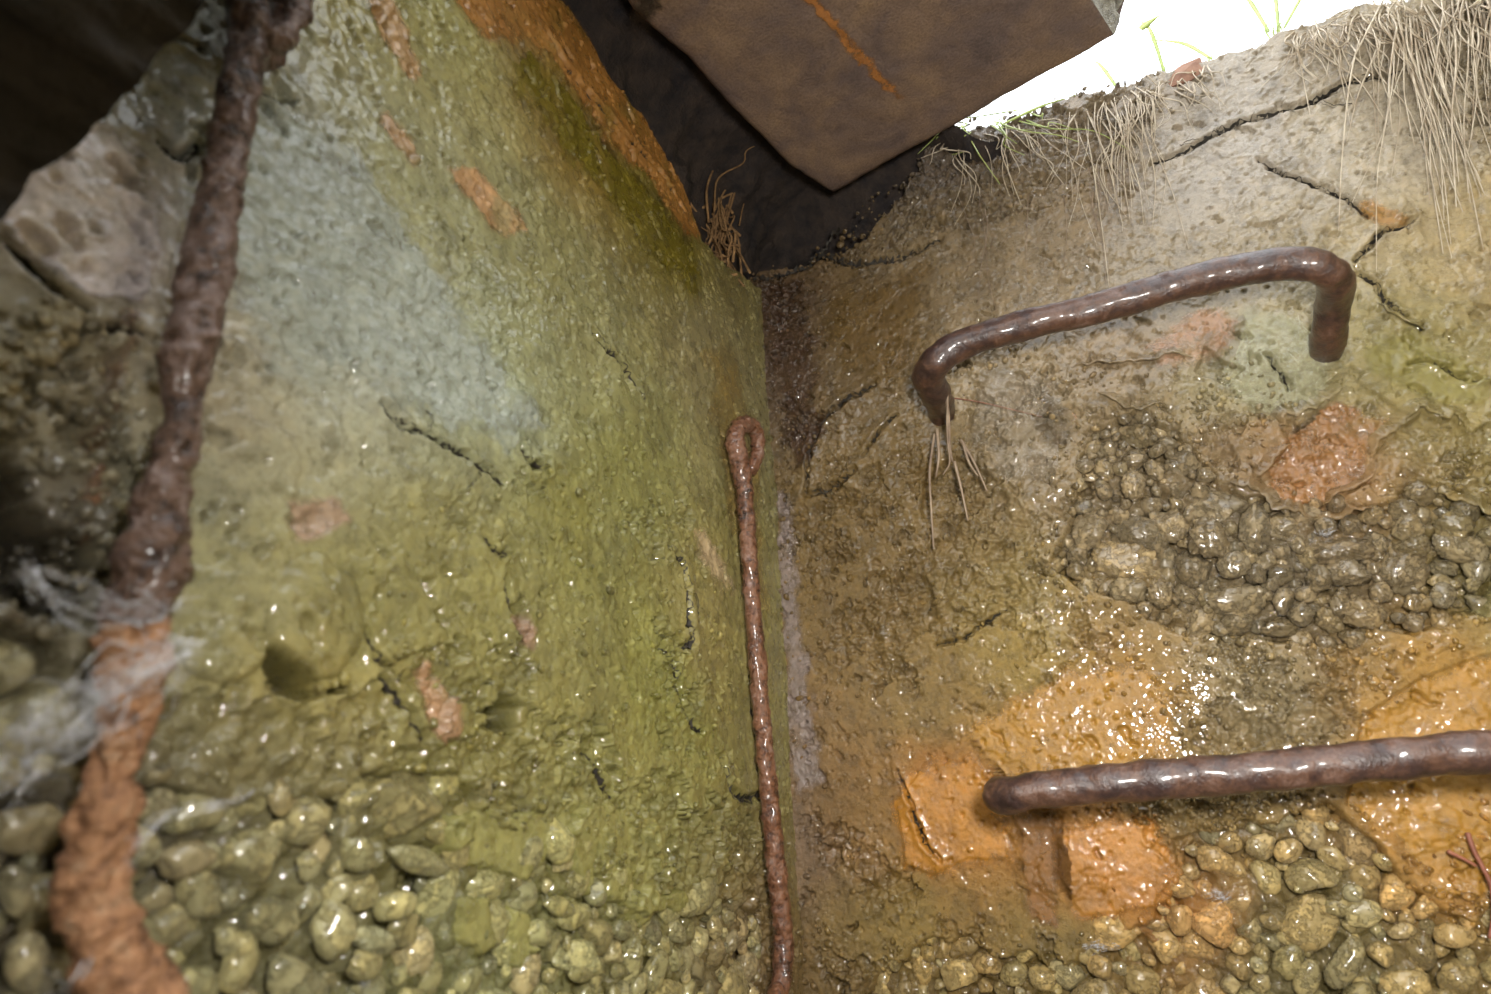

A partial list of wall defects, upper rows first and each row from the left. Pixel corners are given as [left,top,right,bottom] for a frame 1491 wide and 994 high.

crack [1153,71,1400,165]
corrosion [47,0,314,994]
crack [381,403,548,488]
spalling [1043,397,1491,649]
crack [1265,355,1289,391]
crack [1258,159,1478,383]
spalling [0,633,84,994]
spalling [131,771,763,994]
corrosion [893,664,1177,926]
spalling [871,803,1491,994]
corrosion [1347,774,1491,897]
corrosion [1360,660,1491,741]